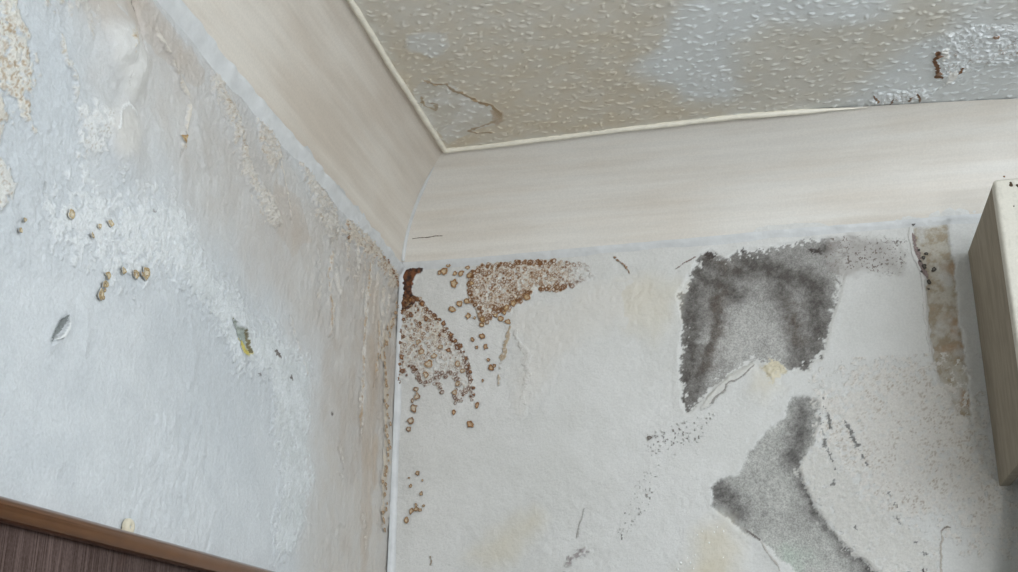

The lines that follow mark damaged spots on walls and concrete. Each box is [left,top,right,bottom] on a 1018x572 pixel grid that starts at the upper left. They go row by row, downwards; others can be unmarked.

leakage [354,0,1018,148]
peeling [864,23,1018,106]
peeling [54,315,72,341]
leakage [0,0,595,572]
leakage [608,265,693,355]